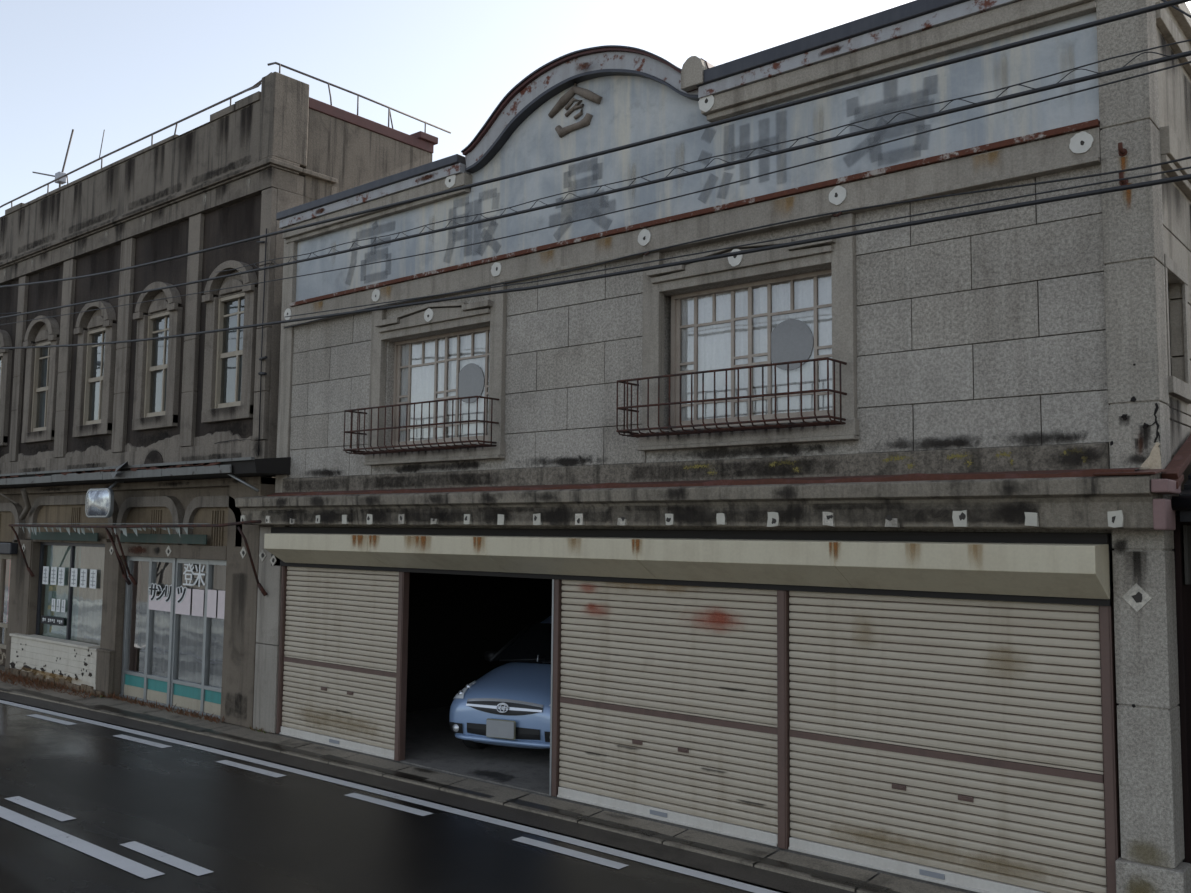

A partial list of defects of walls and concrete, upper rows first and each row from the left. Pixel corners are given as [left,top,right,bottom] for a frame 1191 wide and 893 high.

water stain [398,462,478,472]
water stain [538,456,585,466]
water stain [694,444,821,474]
water stain [894,439,968,449]
spalling [1139,442,1162,470]
crack [1150,403,1161,455]
water stain [477,494,521,524]
peeling [10,644,92,681]